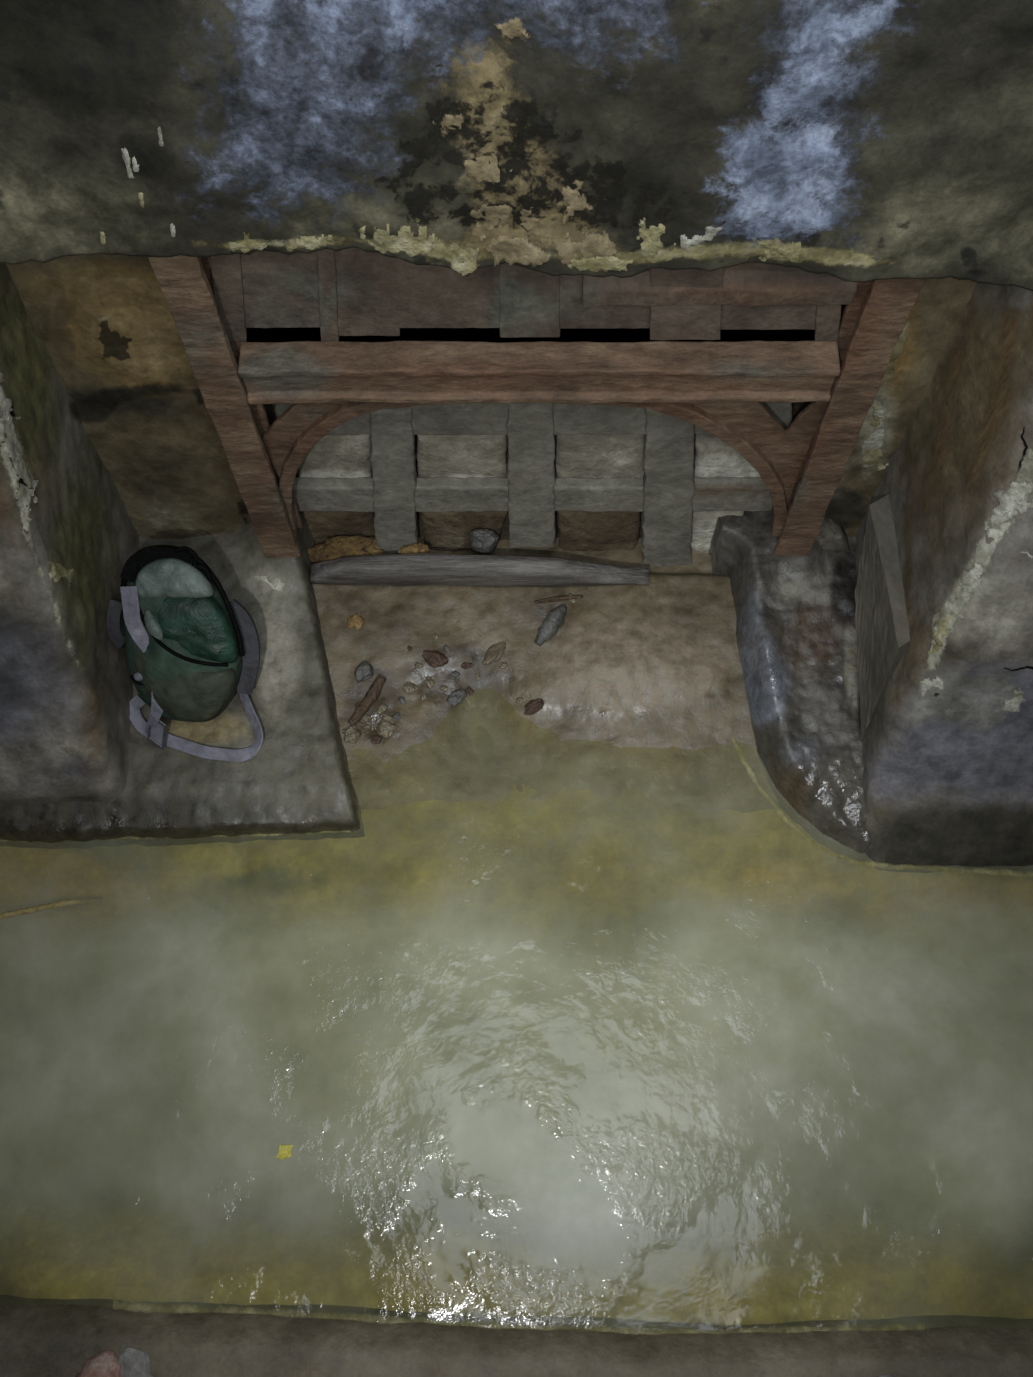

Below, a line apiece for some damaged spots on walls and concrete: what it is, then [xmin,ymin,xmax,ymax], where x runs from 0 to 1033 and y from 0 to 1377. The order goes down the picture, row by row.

damp [202,0,689,232]
peeling [193,17,895,275]
damp [673,0,896,250]
crack [1003,664,1033,672]